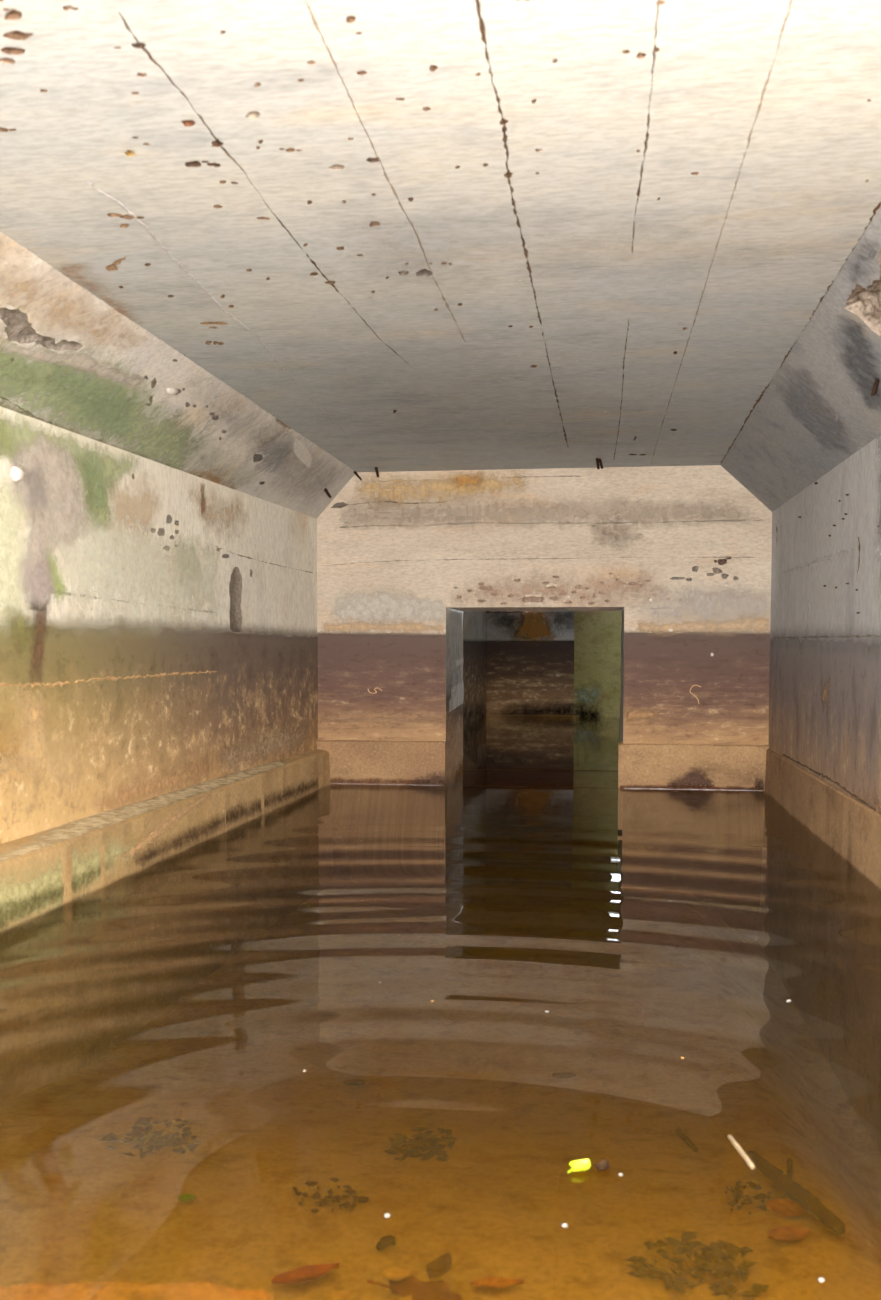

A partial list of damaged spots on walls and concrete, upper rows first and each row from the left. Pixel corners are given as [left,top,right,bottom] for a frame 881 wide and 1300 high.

peeling [0,307,83,351]
leakage [0,323,142,387]
crack [119,13,409,365]
crack [306,3,465,341]
crack [475,0,568,447]
crack [632,0,660,254]
crack [721,202,881,463]
spalling [845,249,881,337]
leakage [0,435,599,864]
leakage [623,593,881,813]